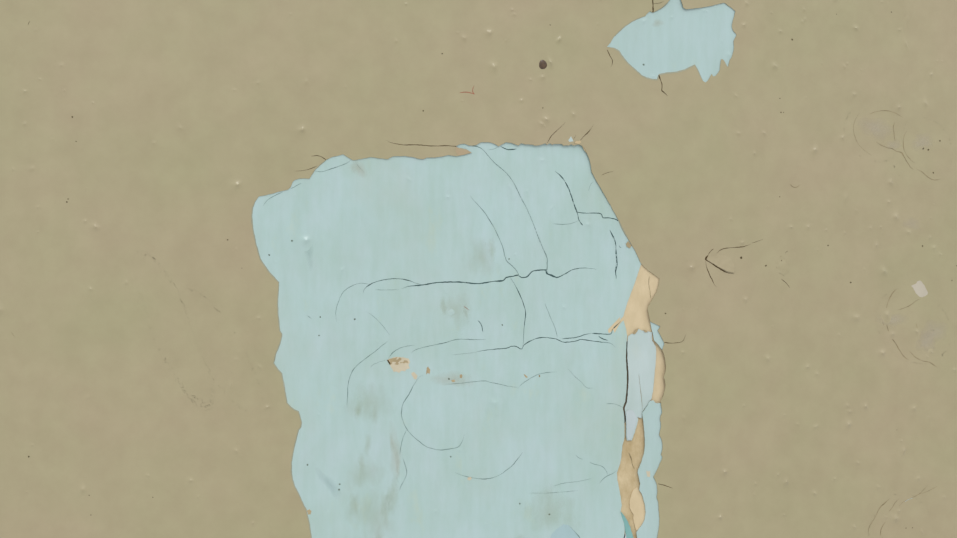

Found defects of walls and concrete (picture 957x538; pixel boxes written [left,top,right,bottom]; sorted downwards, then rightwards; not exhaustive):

peeling [607,0,736,82]
crack [400,380,464,488]
peeling [251,137,666,538]
crack [335,141,621,399]